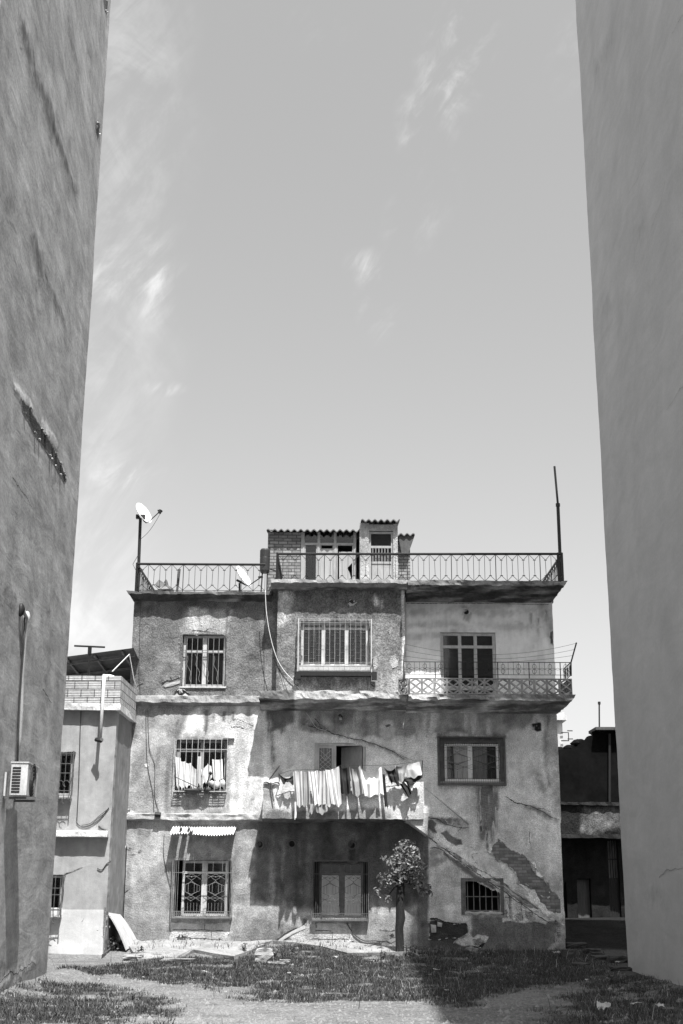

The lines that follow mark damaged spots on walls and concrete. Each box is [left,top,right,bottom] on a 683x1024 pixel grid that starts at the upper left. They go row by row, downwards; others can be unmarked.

spalling [12,378,67,484]
flaking render [428,819,561,925]
crack [507,797,559,845]